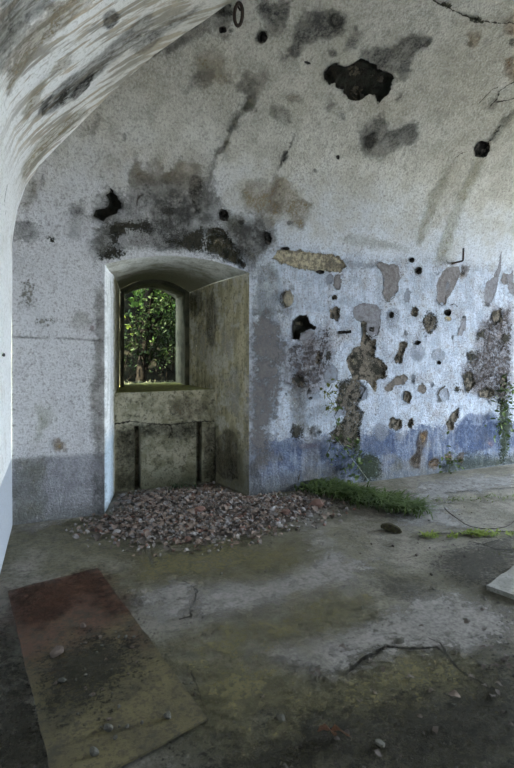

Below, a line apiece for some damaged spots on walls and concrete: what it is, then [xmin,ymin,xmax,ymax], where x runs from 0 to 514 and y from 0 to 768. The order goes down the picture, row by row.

water stain [0,0,79,96]
water stain [41,10,206,114]
water stain [283,8,345,59]
spalling [324,58,401,103]
crack [433,0,514,24]
water stain [361,116,418,155]
spalling [93,188,124,223]
water stain [94,174,312,269]
spalling [272,247,514,451]
water stain [290,424,322,440]
crack [179,580,198,620]
crack [345,637,488,687]